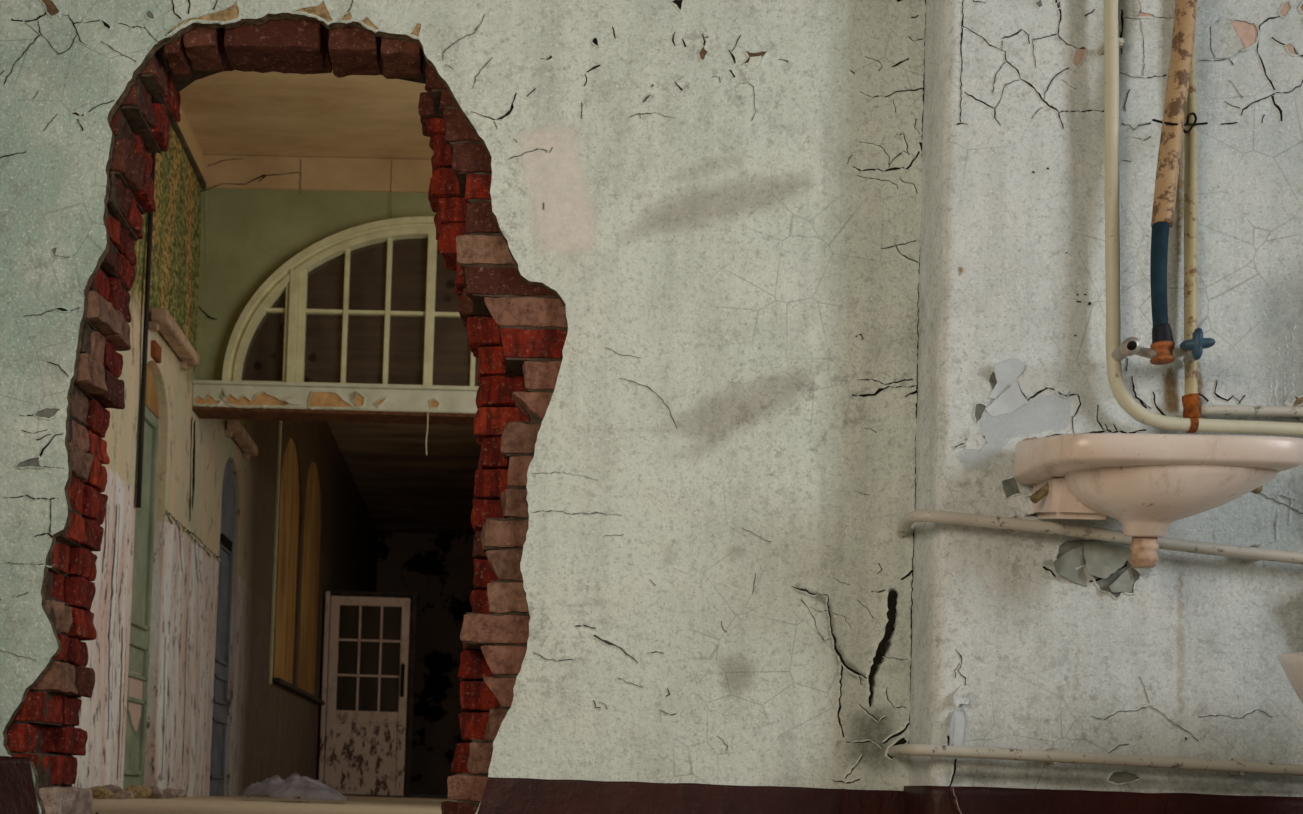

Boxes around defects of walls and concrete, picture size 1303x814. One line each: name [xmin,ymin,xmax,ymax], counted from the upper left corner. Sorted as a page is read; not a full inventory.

crack [0,0,218,158]
flaking render [165,0,242,36]
flaking render [293,0,380,33]
crack [846,0,926,194]
crack [956,0,1174,164]
crack [1198,15,1303,125]
flaking render [15,455,45,470]
flaking render [33,406,63,421]
peeling [191,387,389,521]
crack [791,235,921,785]
peeling [951,358,1028,450]
crack [1017,358,1166,437]